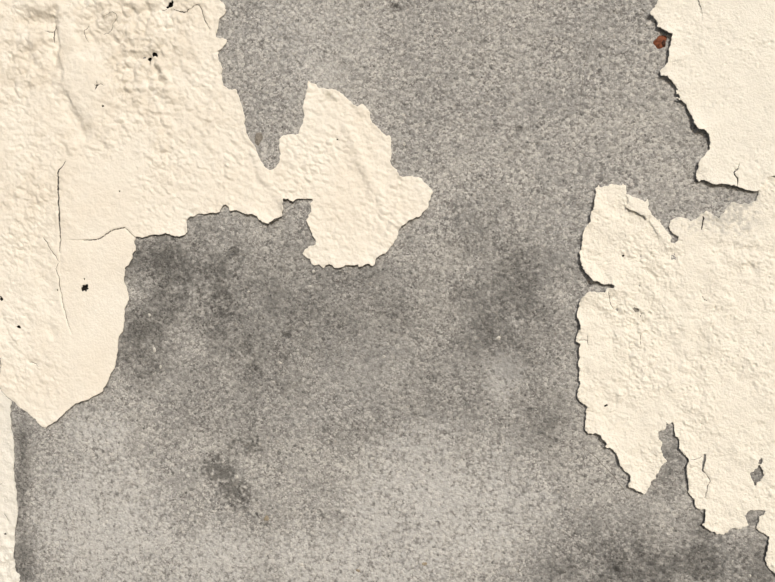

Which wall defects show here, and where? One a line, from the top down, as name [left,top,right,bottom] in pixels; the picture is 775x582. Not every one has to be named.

crack [43,162,70,328]
peeling [0,0,433,582]
corrosion [653,35,667,49]
peeling [576,0,775,573]